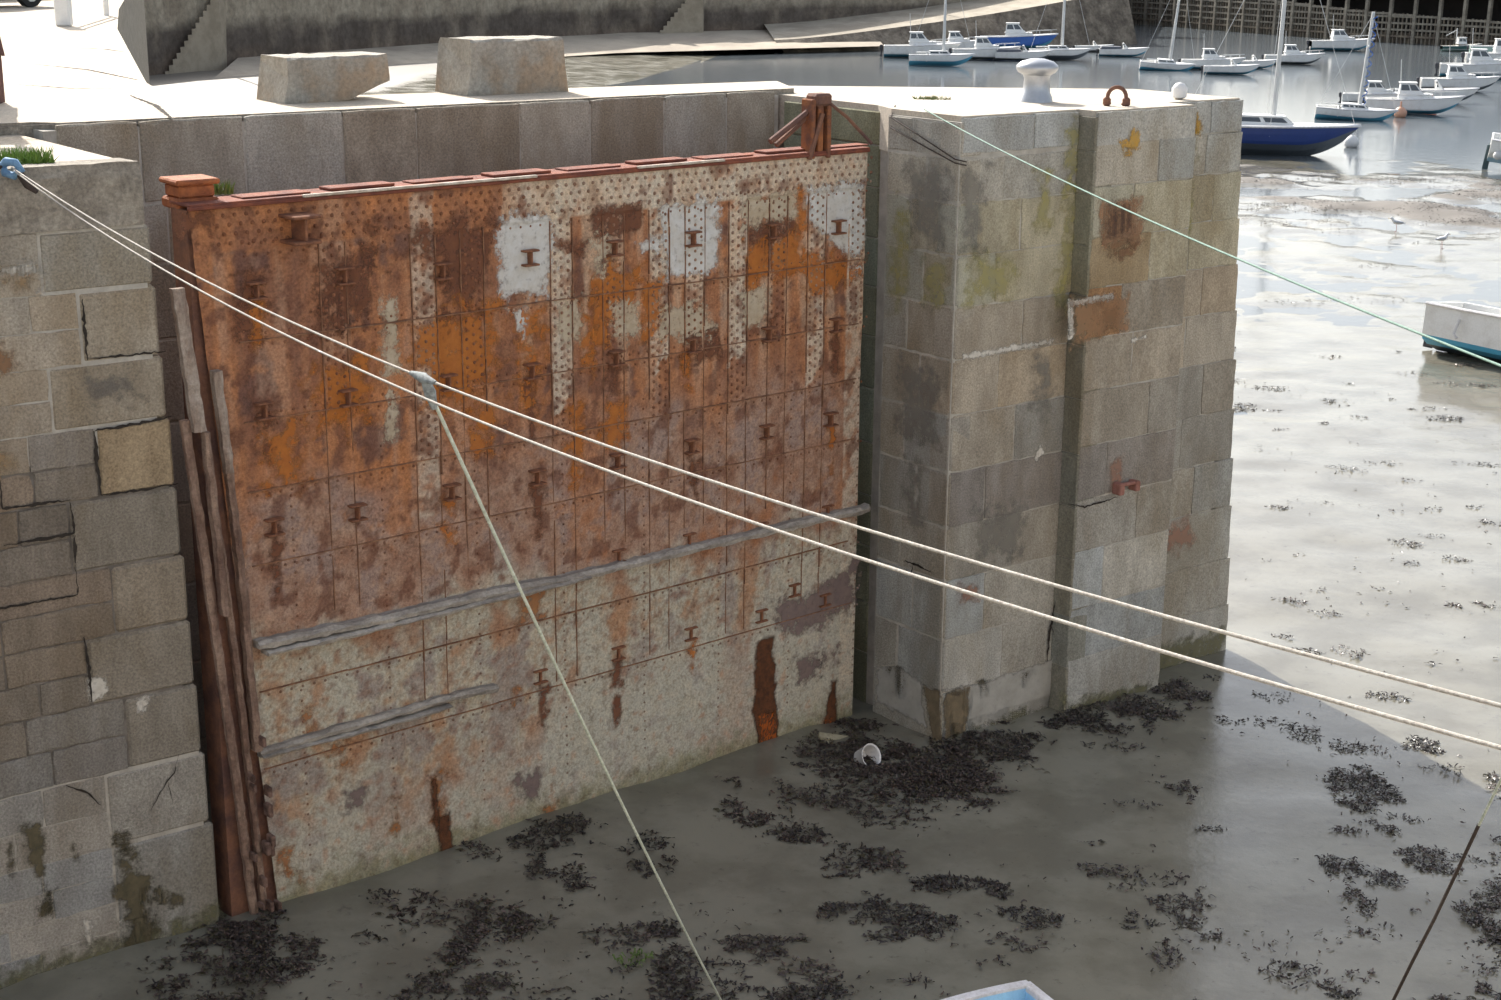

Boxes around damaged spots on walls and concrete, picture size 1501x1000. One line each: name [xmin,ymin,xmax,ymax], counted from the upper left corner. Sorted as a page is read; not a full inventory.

rust [560,200,642,259]
rust [742,185,863,297]
rust [1099,196,1145,262]
rust [229,269,271,345]
rust [407,208,550,458]
rust [560,257,665,491]
rust [257,352,373,497]
rust [517,590,547,625]
rust [610,656,624,726]
crack [151,754,179,810]
water stain [7,823,53,917]
water stain [111,831,184,948]